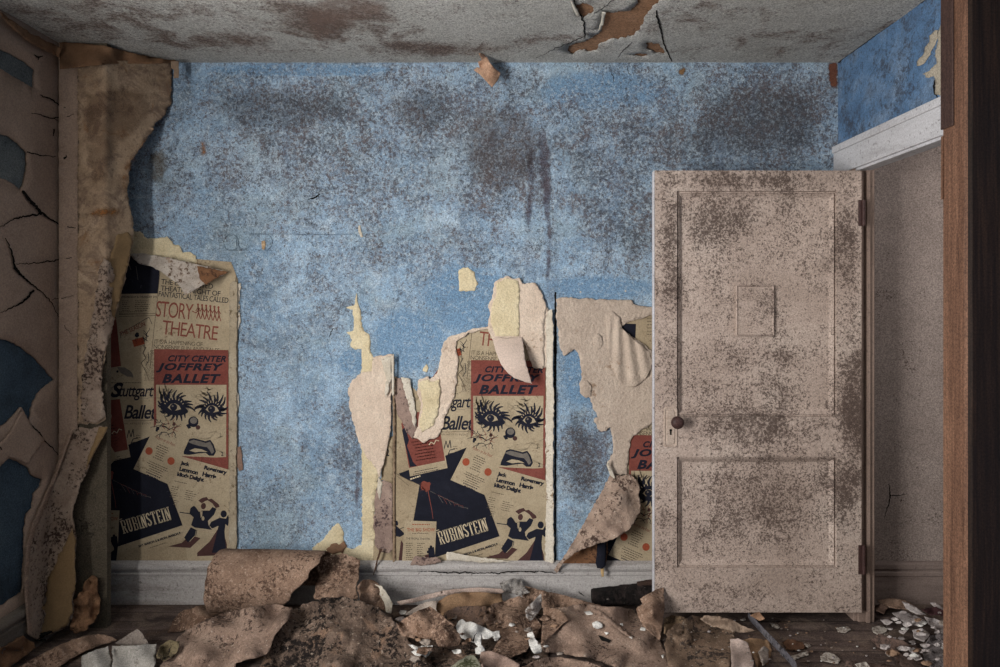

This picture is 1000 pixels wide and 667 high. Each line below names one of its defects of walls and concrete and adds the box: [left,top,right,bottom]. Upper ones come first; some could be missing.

peeling [59,42,179,78]
peeling [474,53,500,87]
spalling [568,0,659,54]
spalling [635,42,665,56]
crack [656,10,672,62]
peeling [917,25,941,96]
crack [27,76,79,159]
damp [526,130,551,238]
crack [0,190,79,427]
spalling [80,258,115,423]
peeling [381,356,392,396]
spalling [0,339,53,605]